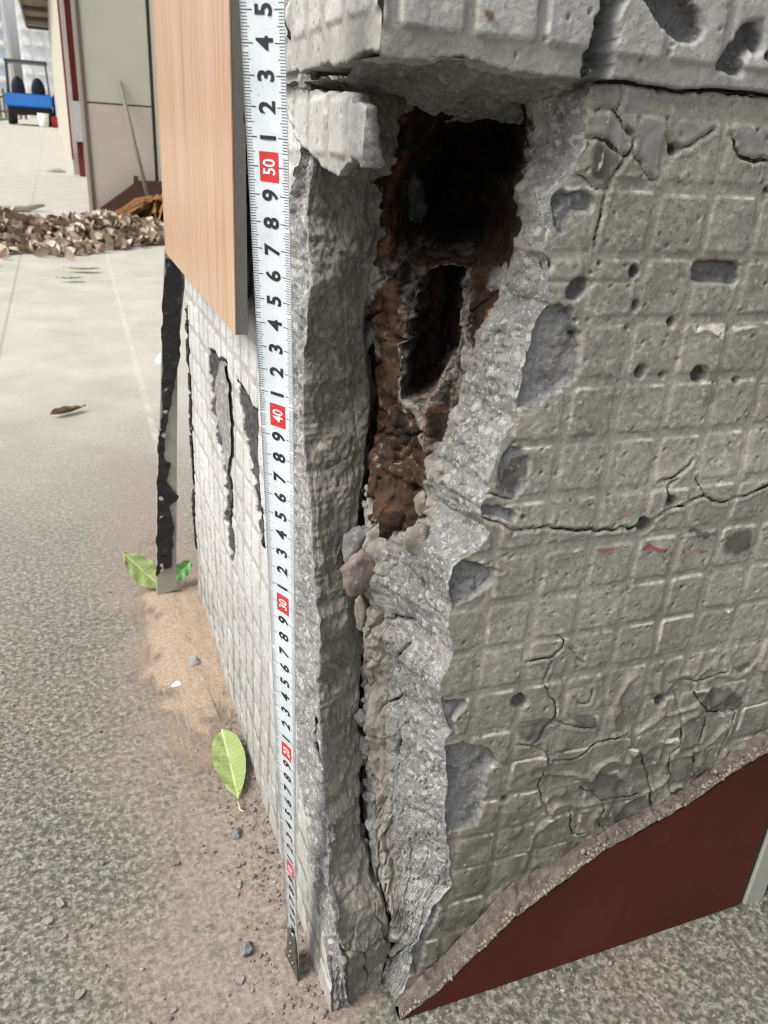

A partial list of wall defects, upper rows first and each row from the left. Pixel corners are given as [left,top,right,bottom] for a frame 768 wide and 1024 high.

crack [577,79,768,246]
spalling [208,347,236,560]
spalling [239,382,265,537]
corrosion [373,280,405,418]
crack [357,314,422,527]
corrosion [367,445,427,520]
corrosion [405,166,516,364]
spalling [289,40,676,1012]
crack [483,460,768,532]
crack [359,651,400,914]
crack [518,635,738,835]